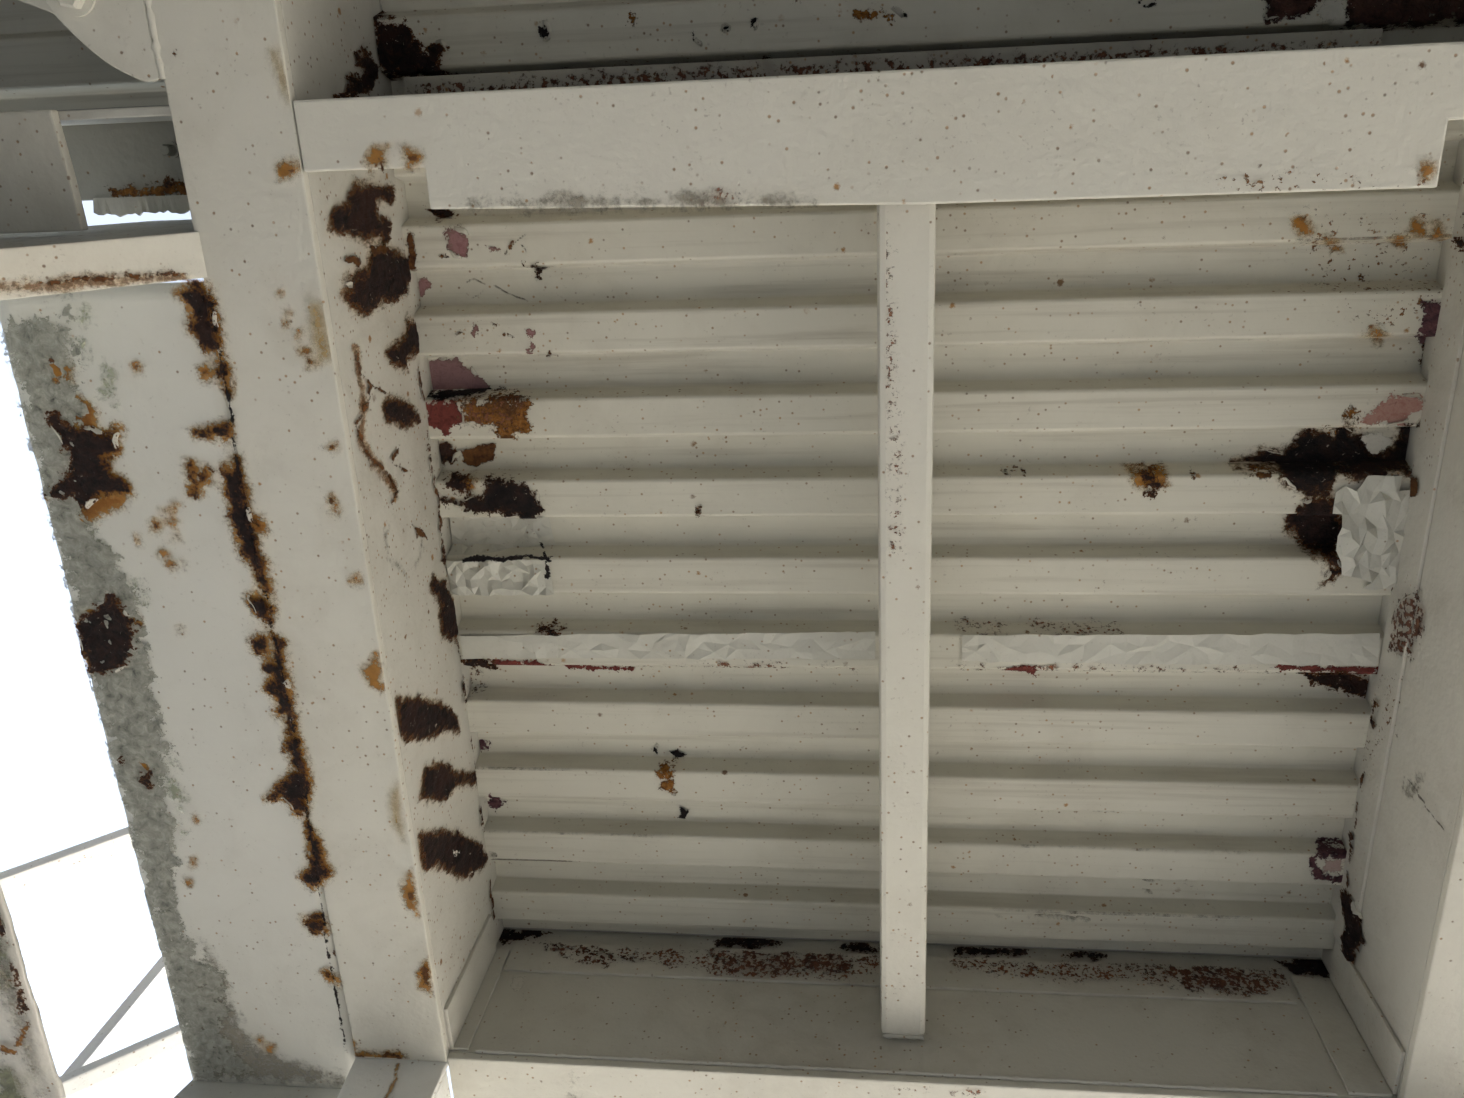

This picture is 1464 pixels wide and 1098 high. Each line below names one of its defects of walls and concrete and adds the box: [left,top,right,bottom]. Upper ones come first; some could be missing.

rust [333,0,1464,98]
rust [43,356,133,524]
rust [0,269,233,395]
rust [192,423,232,440]
peeling [427,357,491,401]
rust [1247,464,1274,479]
rust [327,145,880,981]
rust [73,593,143,676]
rust [135,456,332,889]
rust [1267,587,1425,964]